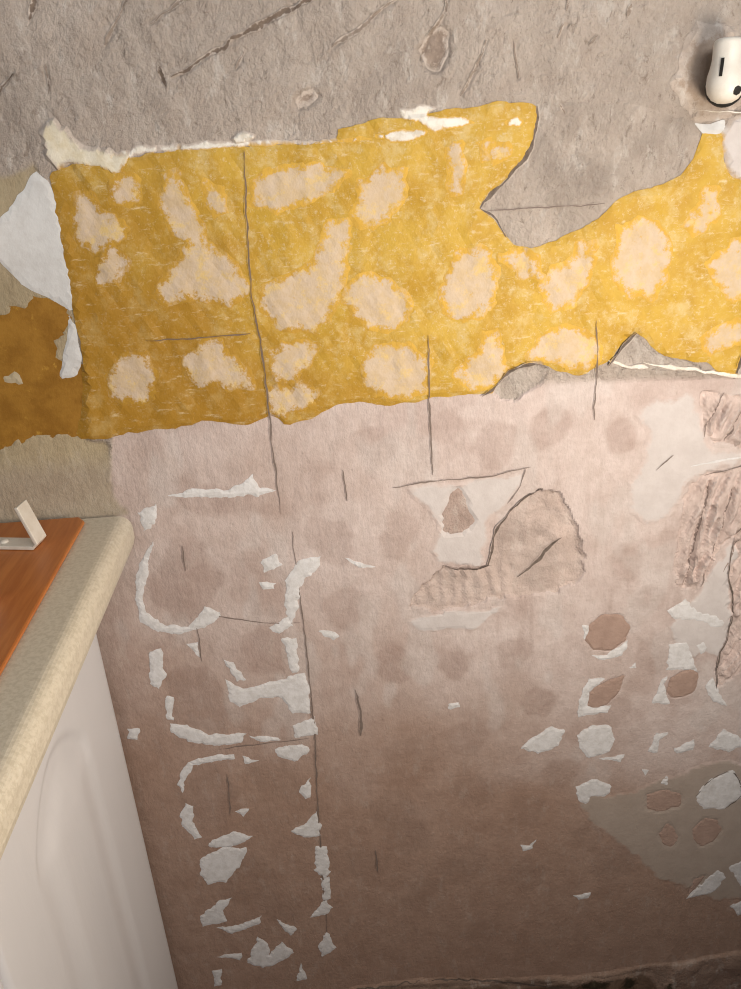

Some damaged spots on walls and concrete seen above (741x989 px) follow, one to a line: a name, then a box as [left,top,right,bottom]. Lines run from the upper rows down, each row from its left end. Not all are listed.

peeling [0,101,741,450]
peeling [168,474,276,498]
peeling [135,542,221,657]
spalling [410,488,585,611]
spalling [582,614,630,660]
spalling [652,465,741,706]
peeling [149,554,321,885]
peeling [577,663,636,762]
peeling [696,770,741,810]
peeling [291,812,333,917]
peeling [200,898,297,986]
leakage [404,971,675,989]